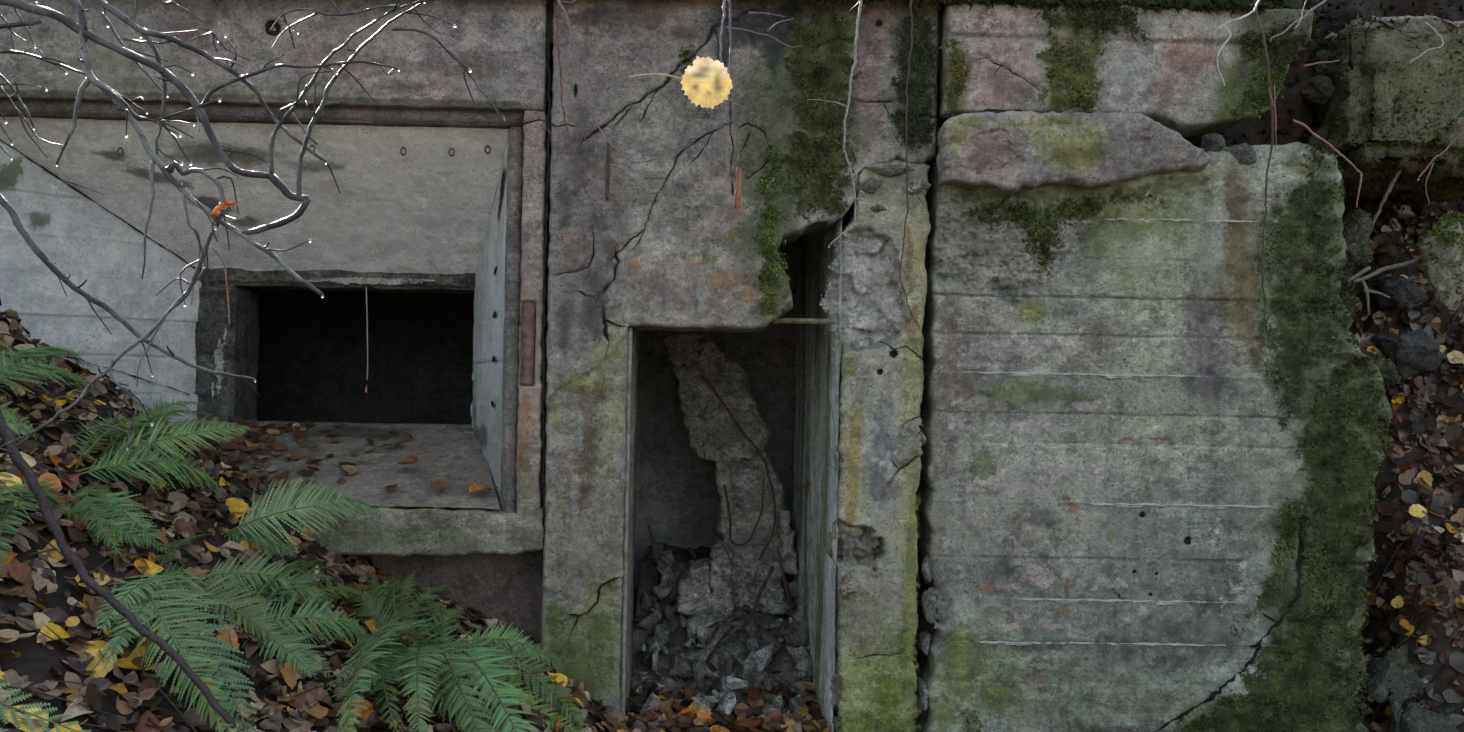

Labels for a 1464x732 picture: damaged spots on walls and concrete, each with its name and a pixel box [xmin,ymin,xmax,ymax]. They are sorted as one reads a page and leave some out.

crack [515,8,782,525]
spalling [819,232,908,353]
spalling [832,518,882,566]
crack [567,576,621,640]
crack [1153,533,1304,732]